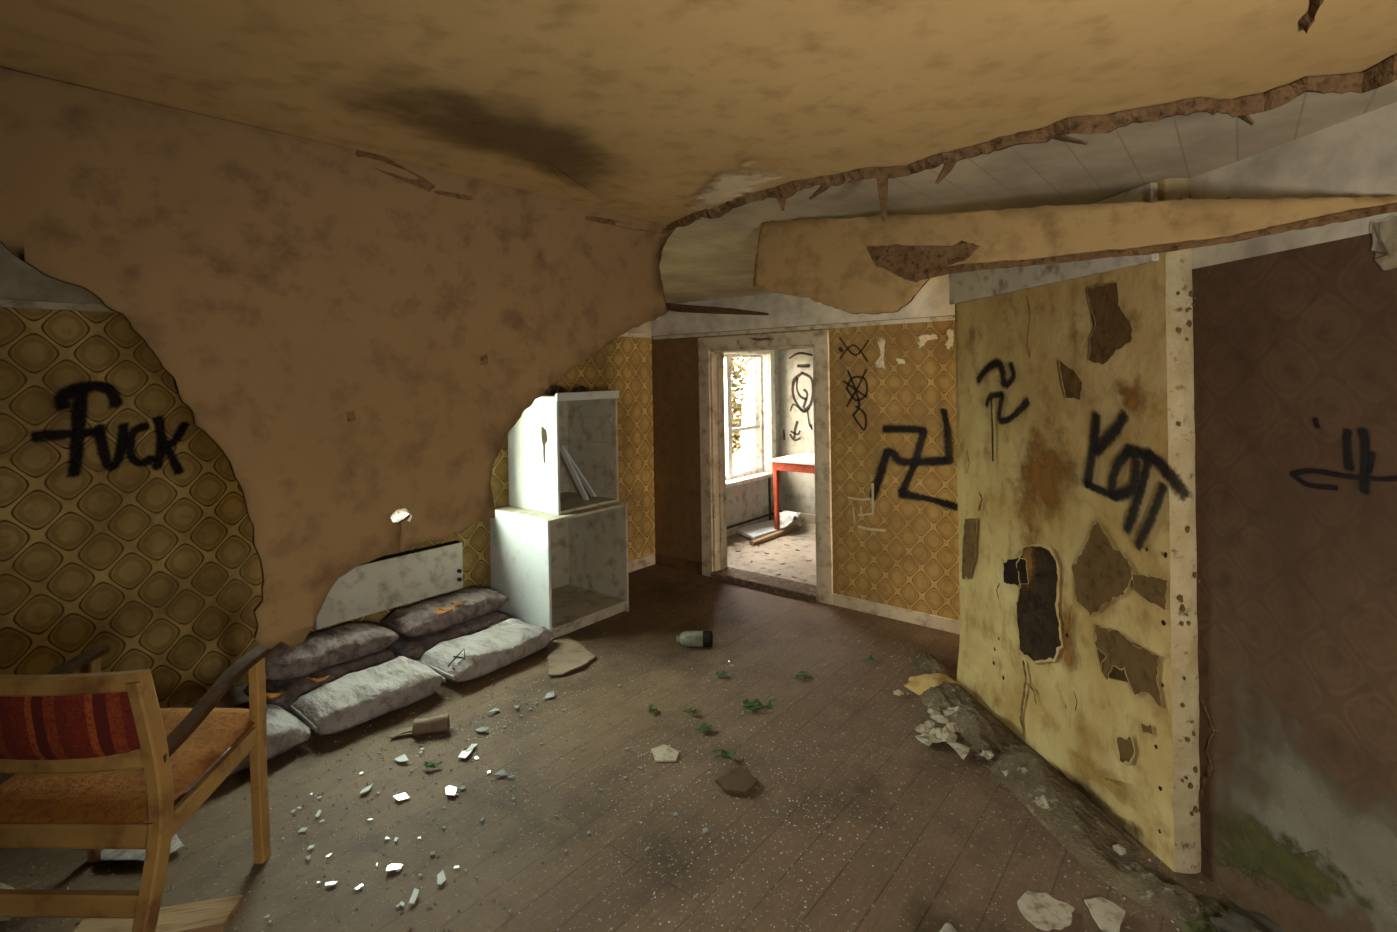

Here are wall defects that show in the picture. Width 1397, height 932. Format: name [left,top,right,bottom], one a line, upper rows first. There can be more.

crack [1298,0,1324,34]
spalling [912,203,1397,281]
peeling [1058,282,1133,402]
peeling [961,518,977,580]
flaking render [1003,520,1191,708]
peeling [1115,722,1158,765]
water stain [1235,733,1397,932]